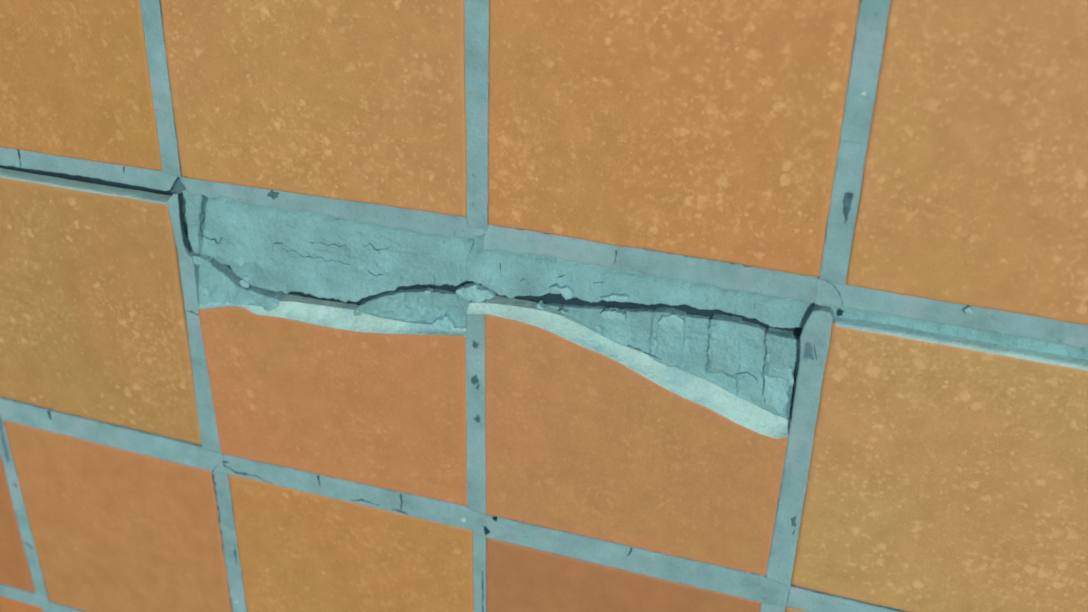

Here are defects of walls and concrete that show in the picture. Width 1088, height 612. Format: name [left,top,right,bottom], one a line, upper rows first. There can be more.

crack [178,193,191,253]
crack [288,281,817,361]
spalling [170,178,813,576]